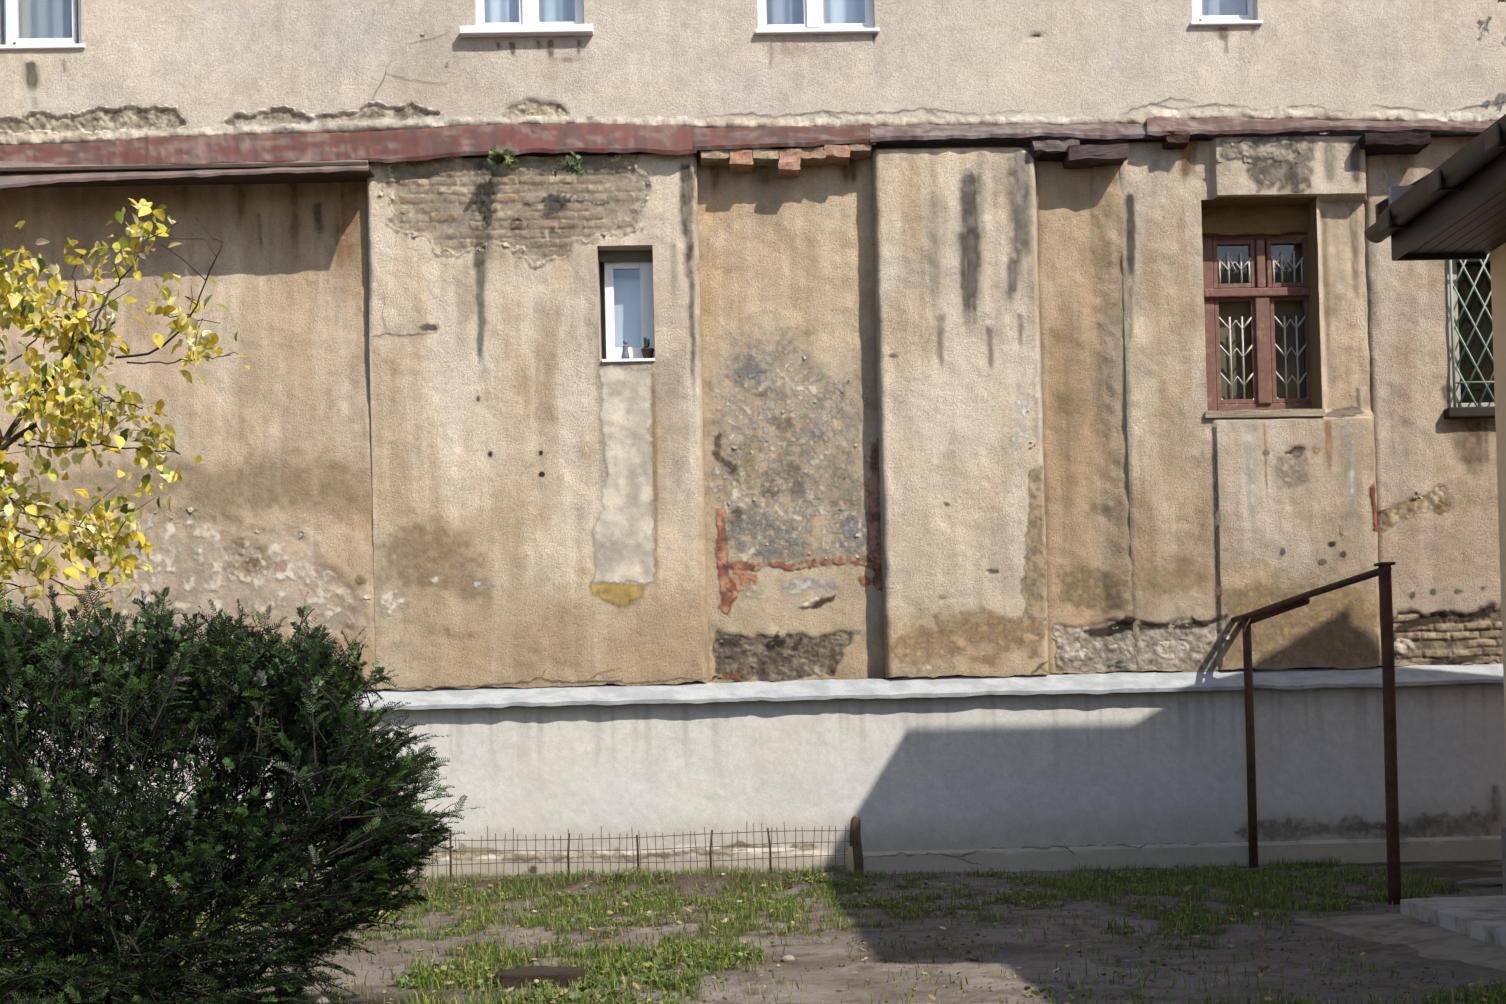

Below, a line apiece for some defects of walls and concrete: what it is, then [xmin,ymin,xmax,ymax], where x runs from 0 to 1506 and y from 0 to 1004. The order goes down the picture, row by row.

spalling [0,102,188,135]
spalling [219,100,443,126]
flaking render [378,154,653,267]
water stain [959,173,980,310]
water stain [1008,151,1030,297]
water stain [672,244,695,361]
peeling [709,331,882,614]
spalling [103,507,405,641]
spalling [1021,467,1232,673]
spalling [713,631,854,682]
flaking render [1393,603,1503,665]
water stain [1237,786,1498,843]